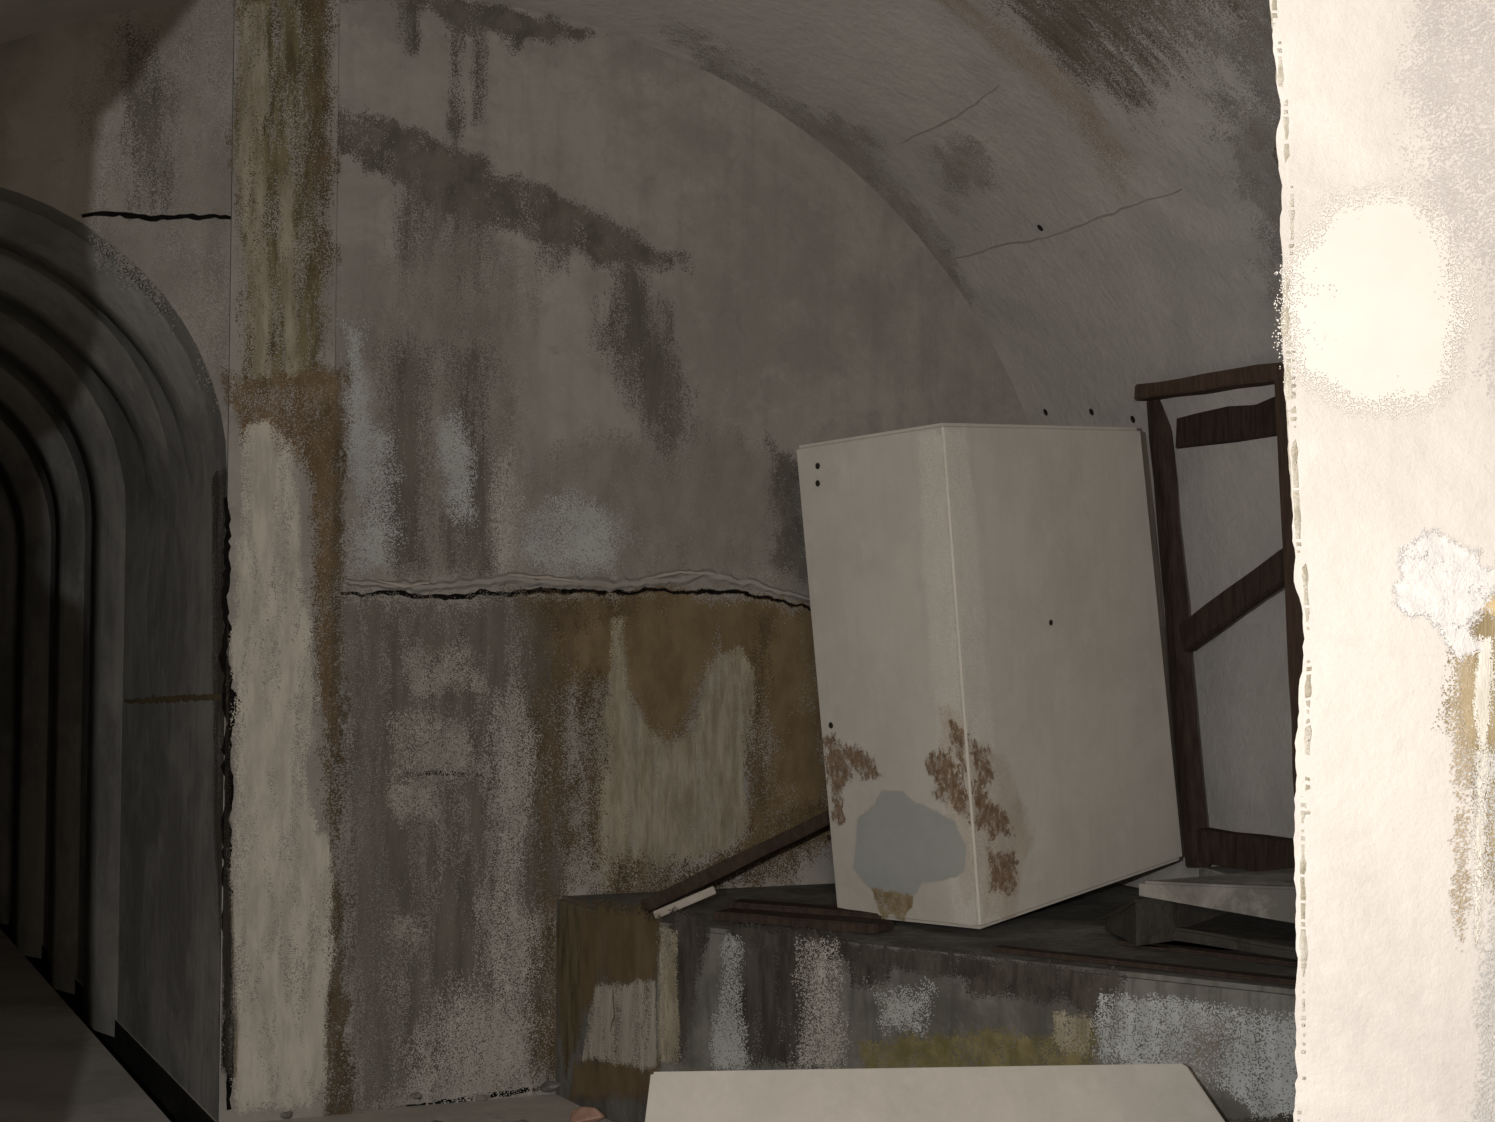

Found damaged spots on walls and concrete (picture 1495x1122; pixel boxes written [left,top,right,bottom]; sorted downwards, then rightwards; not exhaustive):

leakage [64,0,234,417]
spalling [1269,0,1290,163]
leakage [1383,0,1495,398]
corrosion [217,0,364,1116]
spalling [380,636,494,831]
spalling [341,569,811,611]
leakage [210,0,1298,1122]
spalling [1281,186,1310,630]
spalling [1299,776,1310,1054]
spalling [1304,660,1312,755]